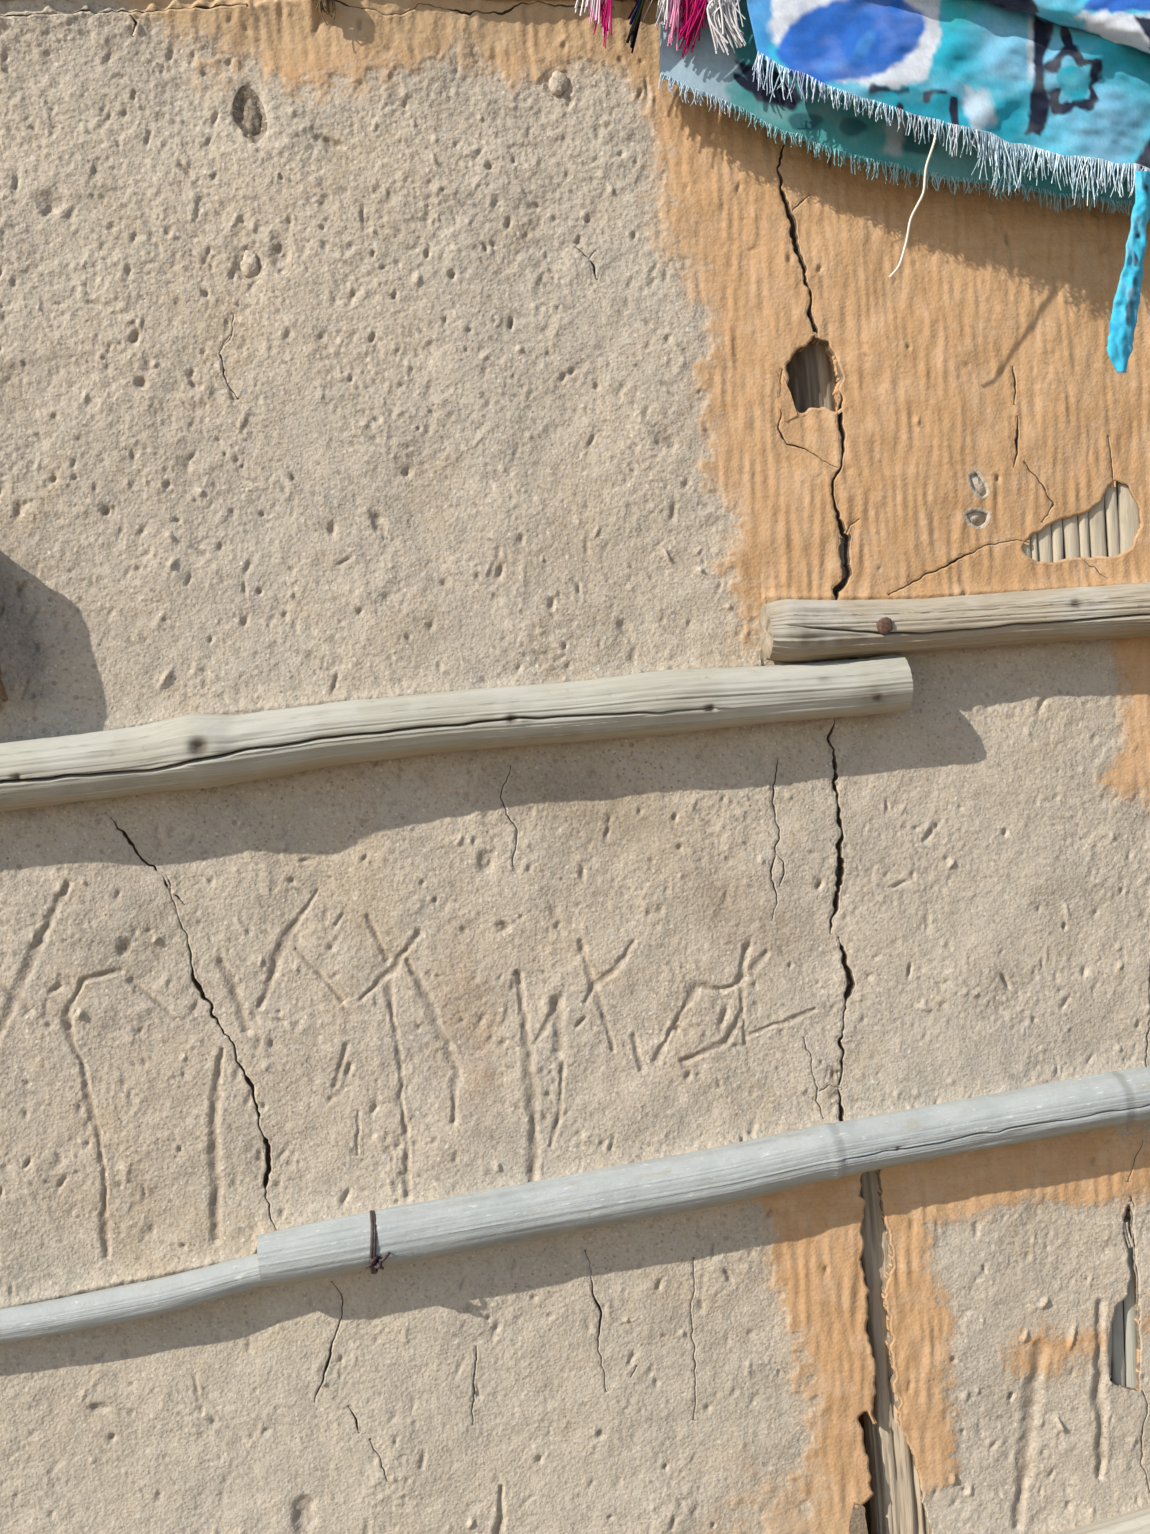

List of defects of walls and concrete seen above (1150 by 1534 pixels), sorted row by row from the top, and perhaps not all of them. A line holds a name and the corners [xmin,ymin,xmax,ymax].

crack [774,136,820,338]
spalling [780,332,846,421]
crack [775,369,861,600]
peeling [963,469,991,530]
spalling [1020,478,1144,566]
crack [110,817,279,1231]
crack [802,718,857,1122]
peeling [830,638,1150,1116]
crack [1142,962,1150,1067]
peeling [917,1183,1150,1534]